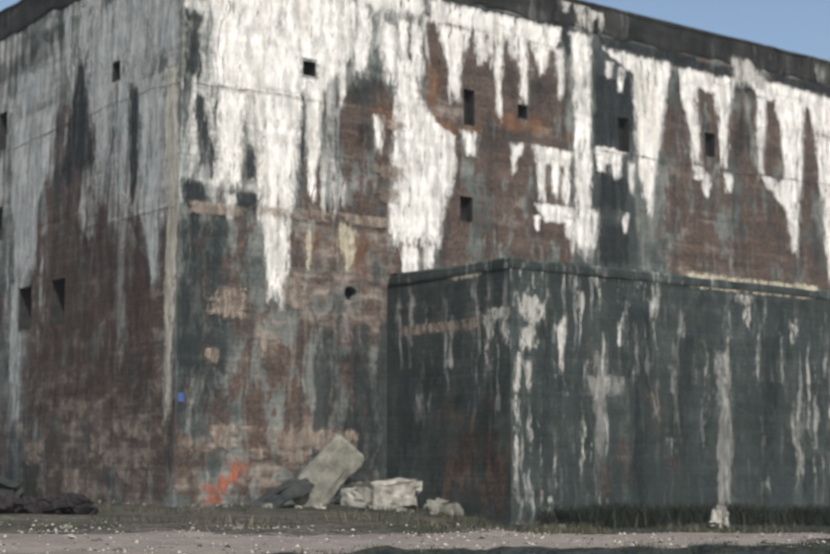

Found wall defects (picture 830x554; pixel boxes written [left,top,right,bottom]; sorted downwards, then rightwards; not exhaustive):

damp [3,49,59,421]
damp [44,0,830,421]
rust [202,461,250,504]